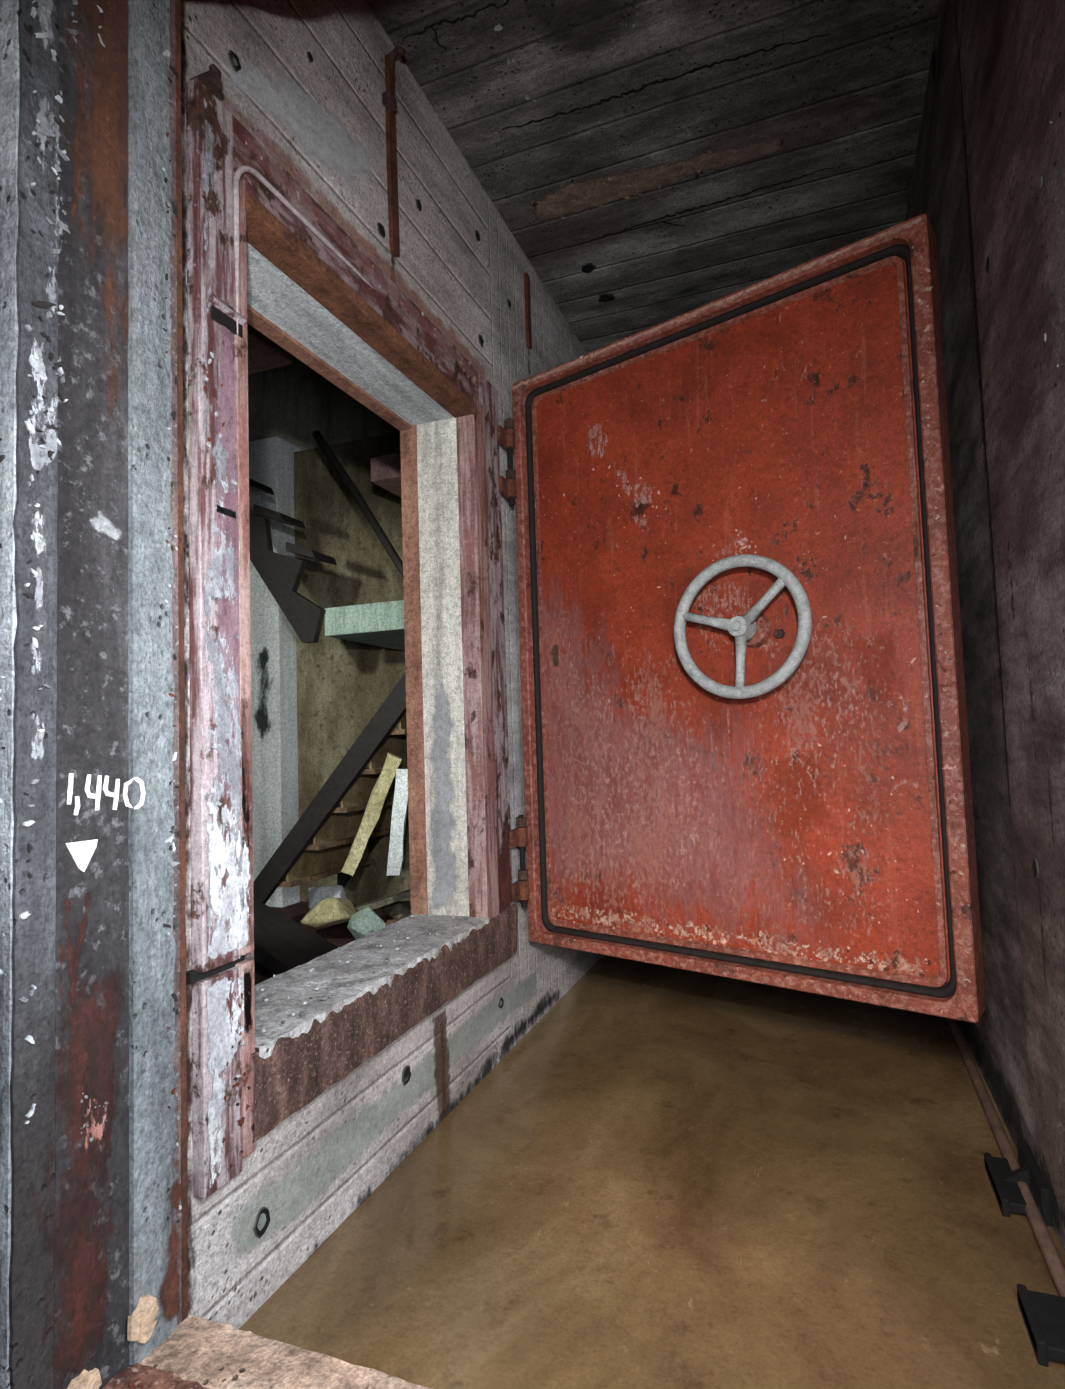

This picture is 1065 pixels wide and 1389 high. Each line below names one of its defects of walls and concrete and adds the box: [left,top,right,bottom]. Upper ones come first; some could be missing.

crack [402,0,509,52]
corrosion [69,0,129,243]
peeling [201,99,215,197]
spalling [530,136,785,220]
peeling [24,90,71,487]
corrosion [244,141,484,418]
peeling [23,503,50,691]
peeling [200,287,252,959]
peeling [31,713,45,759]
spalling [23,779,39,826]
peeling [552,900,932,977]
corrosion [103,1363,209,1389]